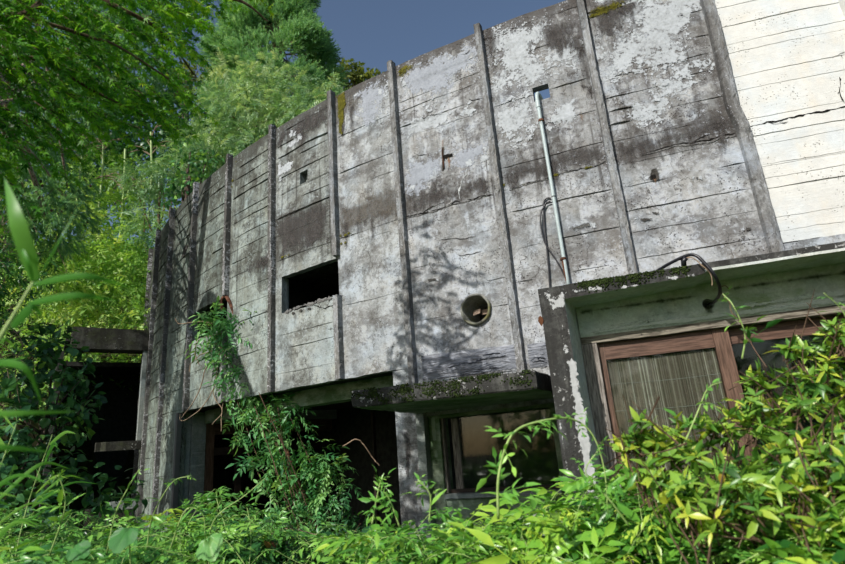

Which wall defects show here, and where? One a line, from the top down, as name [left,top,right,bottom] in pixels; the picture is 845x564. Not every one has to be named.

damp [592,0,637,35]
damp [546,23,592,90]
crack [645,77,845,155]
damp [412,170,493,208]
crack [406,161,605,218]
peeling [546,292,565,310]
peeling [563,345,597,509]